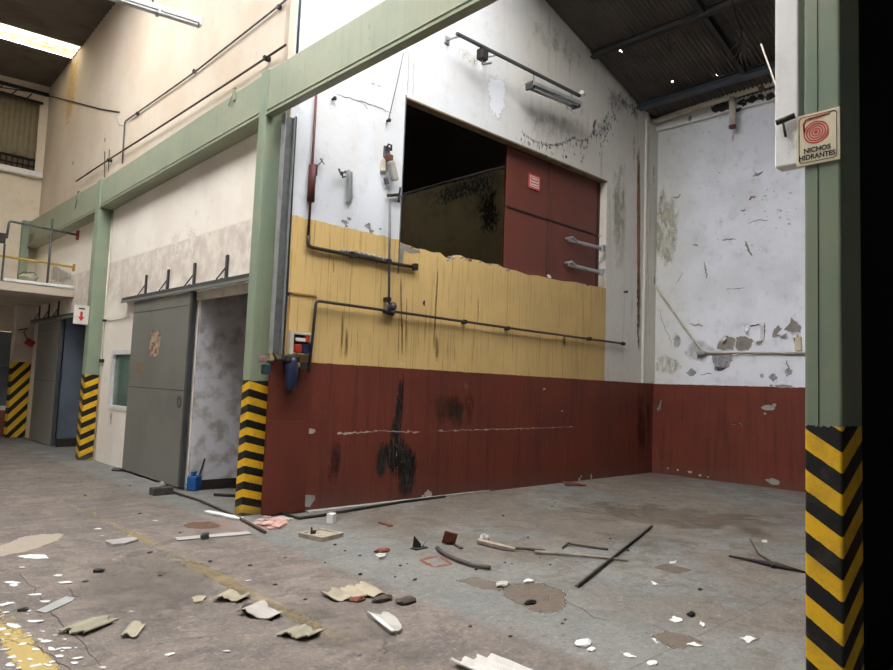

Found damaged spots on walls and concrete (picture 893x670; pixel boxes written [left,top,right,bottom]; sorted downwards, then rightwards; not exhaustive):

damp [521,95,635,165]
spalling [398,243,421,263]
peeling [712,317,803,371]
damp [377,379,416,494]